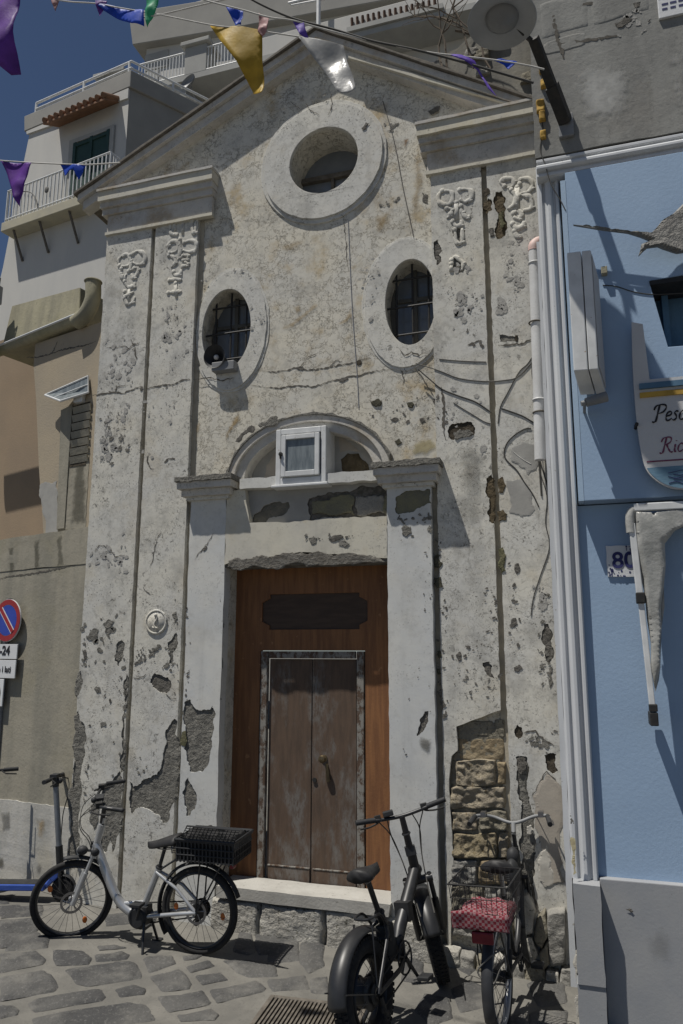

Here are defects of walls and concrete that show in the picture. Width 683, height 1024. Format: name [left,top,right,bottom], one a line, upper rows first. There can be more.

peeling [434,240,484,329]
flaking render [482,188,529,315]
crack [90,377,229,398]
flaking render [448,386,487,454]
flaking render [252,502,290,523]
flaking render [308,485,433,537]
flaking render [485,475,507,524]
flaking render [68,582,216,860]
flaking render [450,719,577,937]